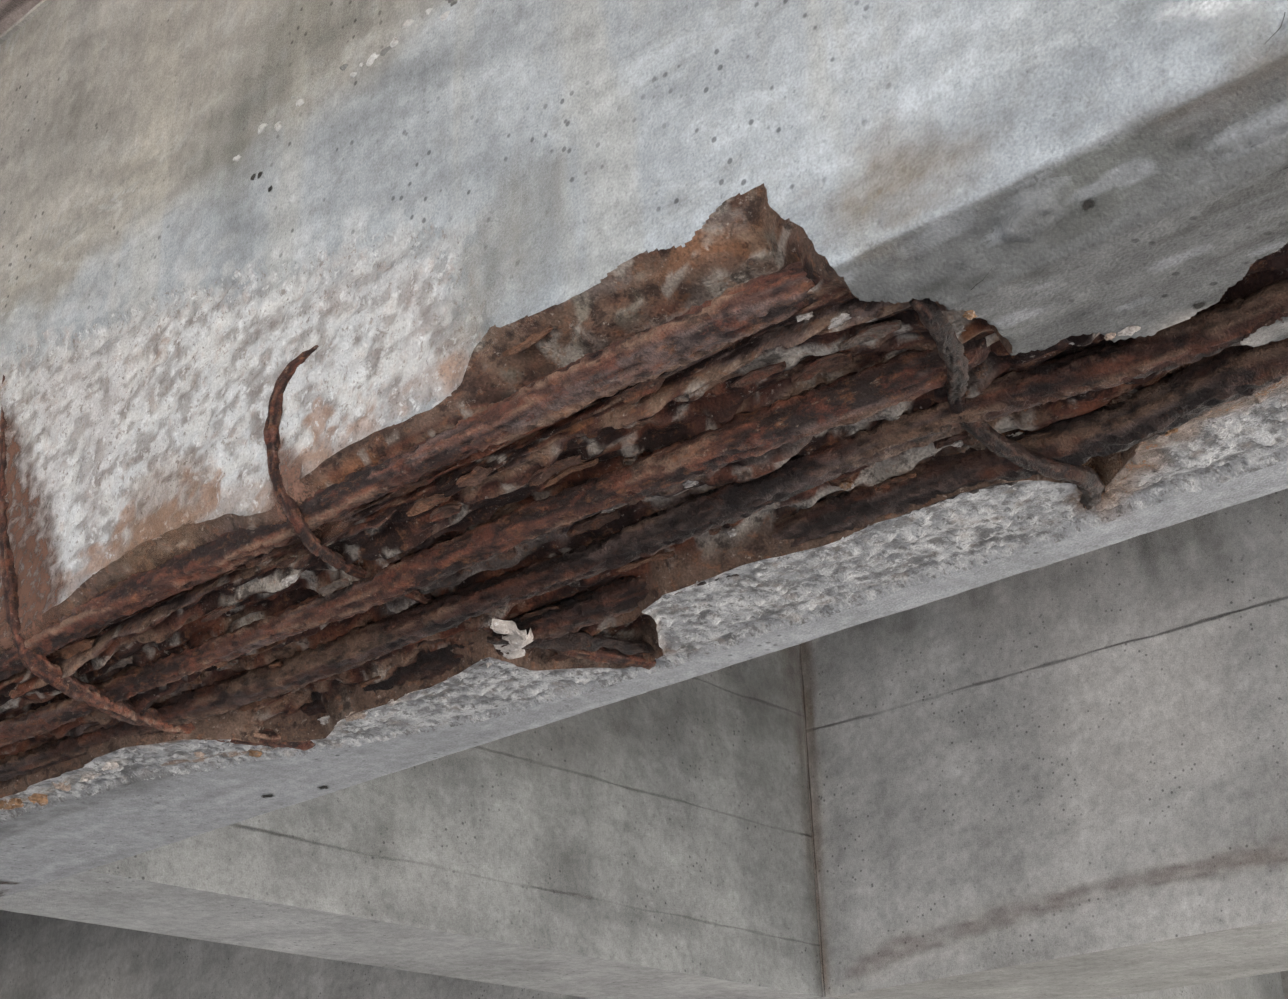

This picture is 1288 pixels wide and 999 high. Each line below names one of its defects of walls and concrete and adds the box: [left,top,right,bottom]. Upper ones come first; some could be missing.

peeling [340,0,457,78]
spalling [935,301,1141,398]
spalling [987,353,1218,437]
spalling [1193,242,1288,315]
spalling [1241,313,1288,341]
peeling [0,183,938,722]
corrosion [0,261,1288,781]
spalling [0,379,1288,824]